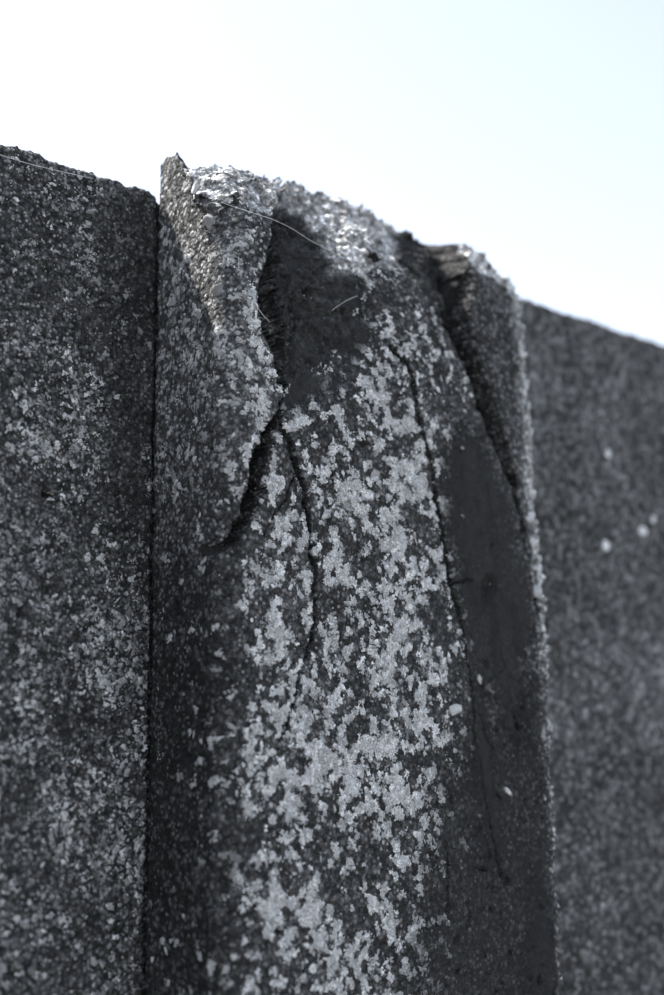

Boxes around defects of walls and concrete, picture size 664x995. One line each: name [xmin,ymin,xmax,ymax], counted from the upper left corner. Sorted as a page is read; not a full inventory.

crack [256,245,285,354]
crack [437,277,471,375]
crack [200,417,287,557]